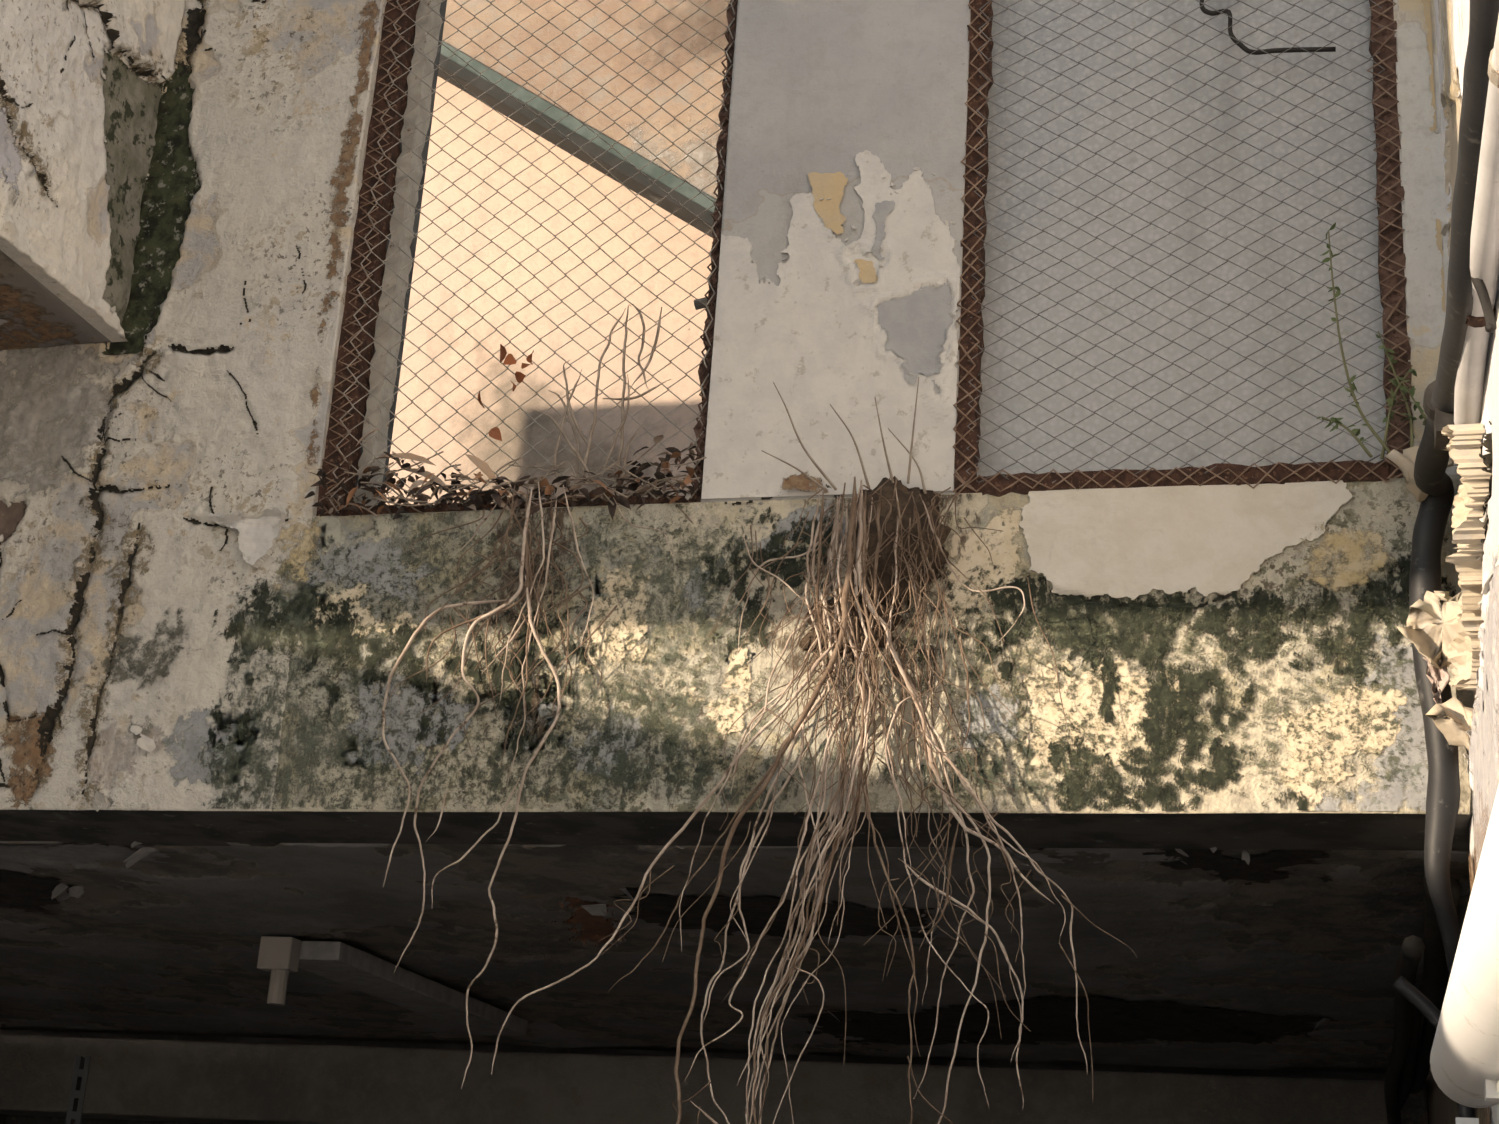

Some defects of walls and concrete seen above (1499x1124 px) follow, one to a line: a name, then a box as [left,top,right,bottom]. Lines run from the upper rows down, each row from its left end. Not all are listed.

crack [60,0,216,86]
peeling [0,106,36,206]
crack [0,63,58,208]
rust [317,1,380,343]
peeling [1421,0,1462,313]
rust [307,367,321,465]
peeling [685,150,961,559]
flaking render [0,500,27,546]
crack [0,281,259,806]
peeling [205,507,286,569]
peeling [939,480,1352,616]